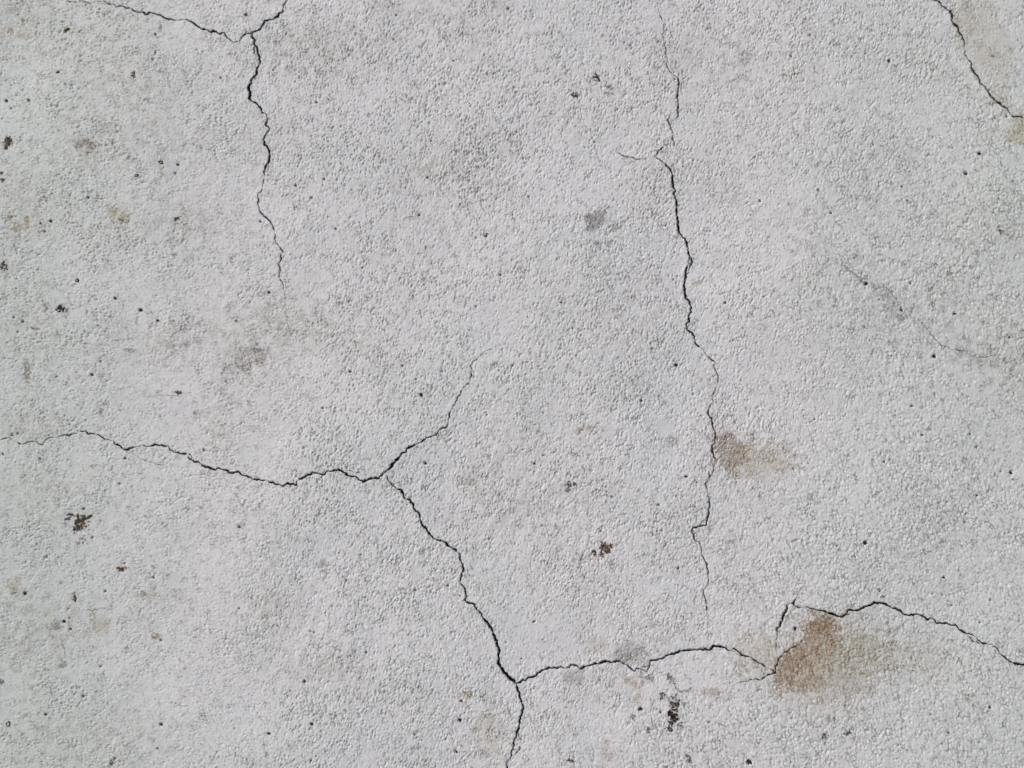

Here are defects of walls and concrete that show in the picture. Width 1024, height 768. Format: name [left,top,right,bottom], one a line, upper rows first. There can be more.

crack [67,0,291,333]
crack [622,7,721,638]
crack [934,0,1024,118]
crack [0,349,1024,768]